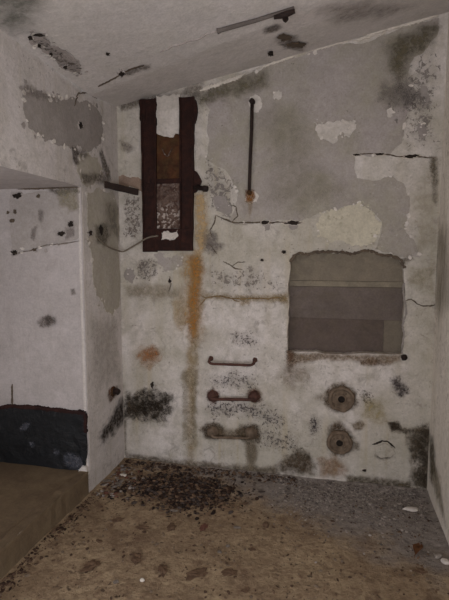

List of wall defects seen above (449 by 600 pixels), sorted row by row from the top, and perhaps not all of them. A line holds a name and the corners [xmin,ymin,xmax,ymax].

spalling [27,30,88,77]
leakage [390,26,437,77]
peeling [205,18,439,269]
crack [362,151,433,159]
peeling [7,79,138,316]
crack [207,205,285,270]
rust [184,195,207,408]
leakage [101,390,172,448]
leakage [347,422,440,498]